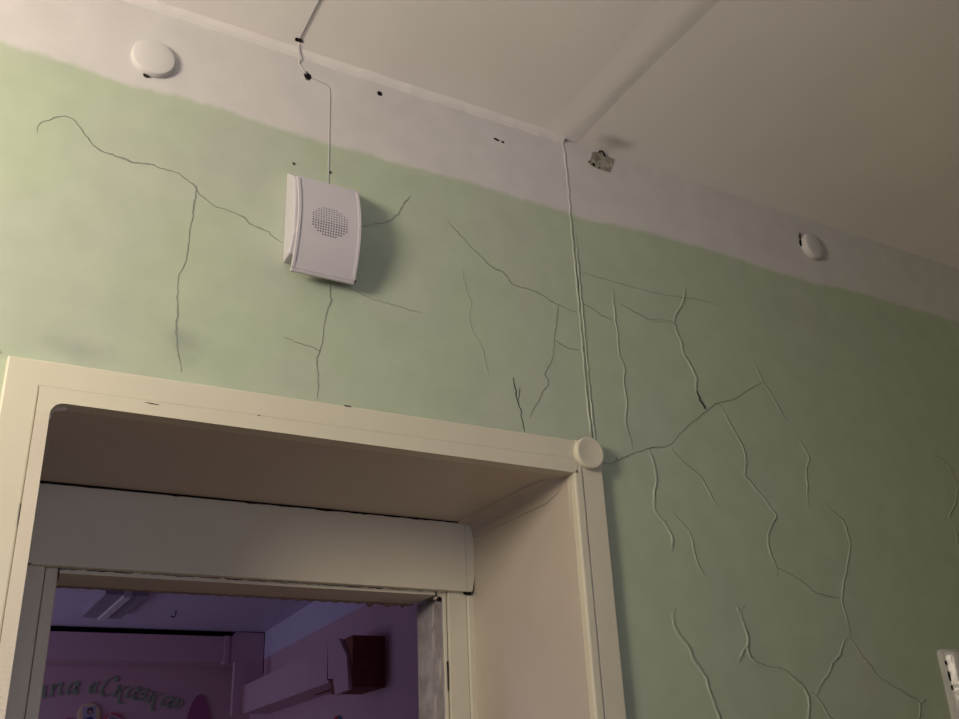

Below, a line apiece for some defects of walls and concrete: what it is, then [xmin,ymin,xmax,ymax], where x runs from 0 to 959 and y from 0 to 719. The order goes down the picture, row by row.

crack [37,115,281,372]
crack [284,283,421,396]